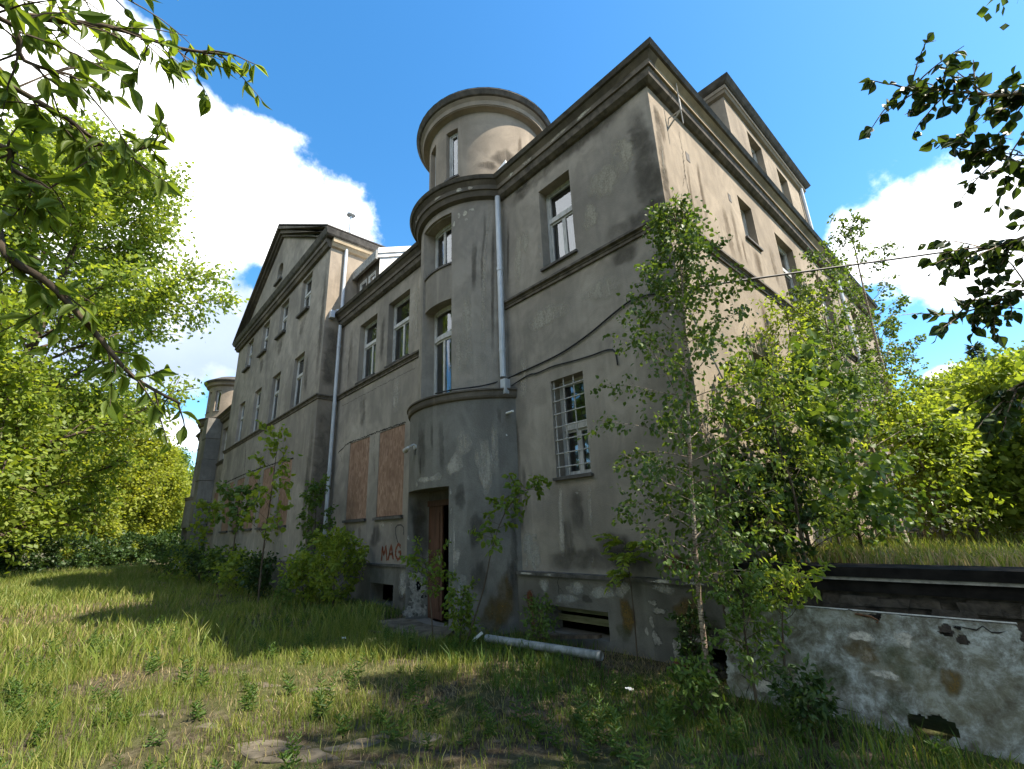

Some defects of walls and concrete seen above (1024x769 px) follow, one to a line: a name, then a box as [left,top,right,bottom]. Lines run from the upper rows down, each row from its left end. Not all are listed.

flaking render [402,565,428,619]
peeling [574,582,630,602]